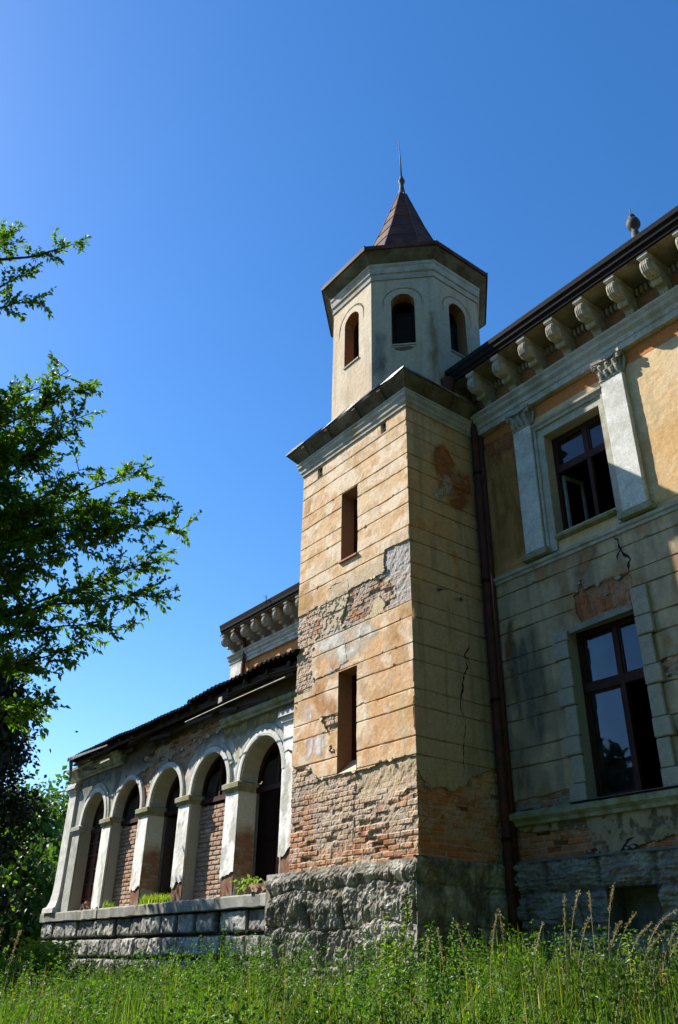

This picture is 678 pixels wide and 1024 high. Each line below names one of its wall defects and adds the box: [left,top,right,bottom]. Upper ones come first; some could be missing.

flaking render [339,539,413,627]
flaking render [574,575,632,622]
crack [613,537,631,572]
flaking render [295,606,324,696]
crack [460,639,470,769]
flaking render [138,721,221,807]
flaking render [289,755,502,872]
flaking render [517,828,600,861]